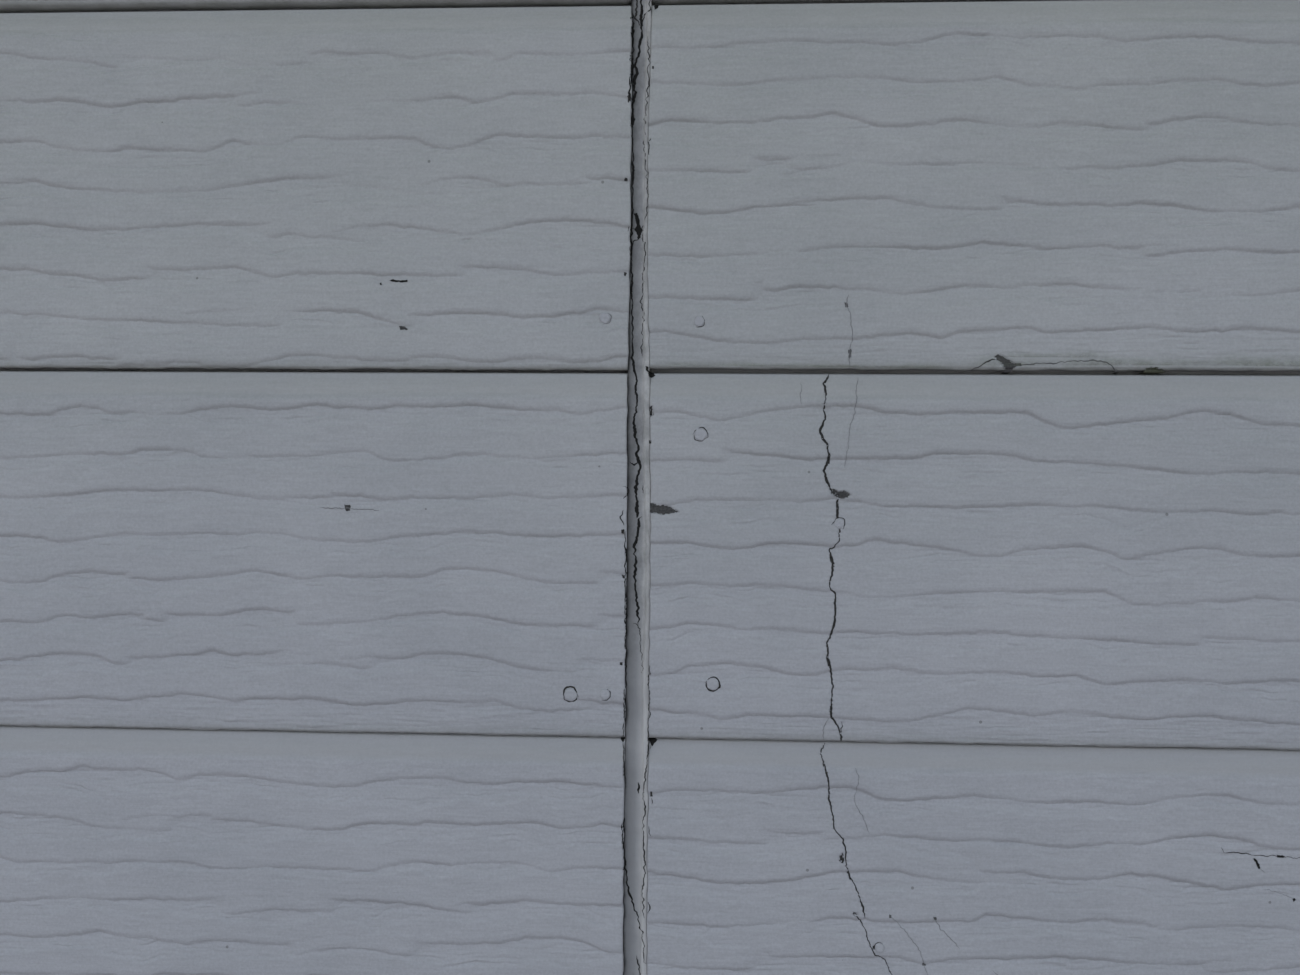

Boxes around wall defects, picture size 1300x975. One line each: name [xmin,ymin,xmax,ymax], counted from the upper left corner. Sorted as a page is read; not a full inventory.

crack [605,0,652,353]
crack [620,392,653,975]
crack [800,295,959,975]